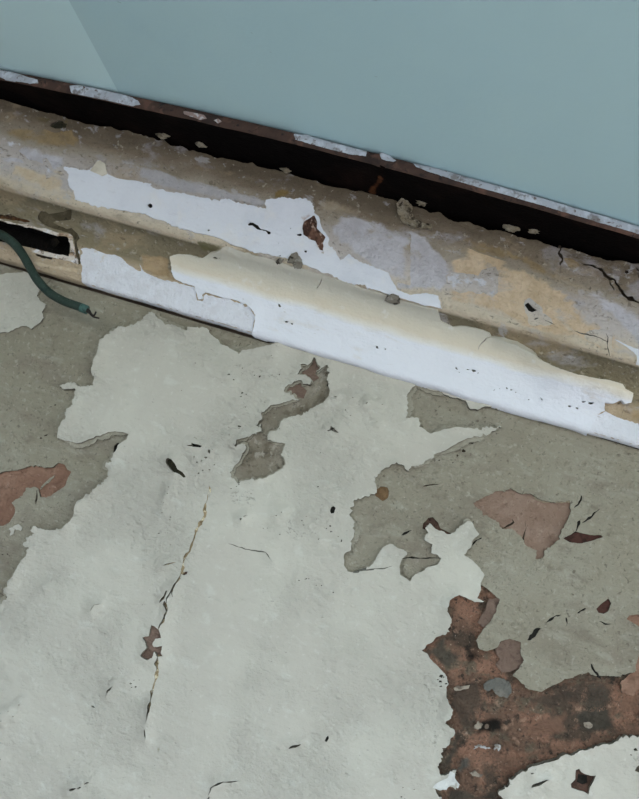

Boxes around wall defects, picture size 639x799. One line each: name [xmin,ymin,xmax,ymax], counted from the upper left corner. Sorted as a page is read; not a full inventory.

flaking render [39,210,81,264]
corrosion [300,209,329,252]
crack [583,264,639,303]
peeling [0,246,639,799]
crack [159,486,211,628]
crack [148,655,160,713]